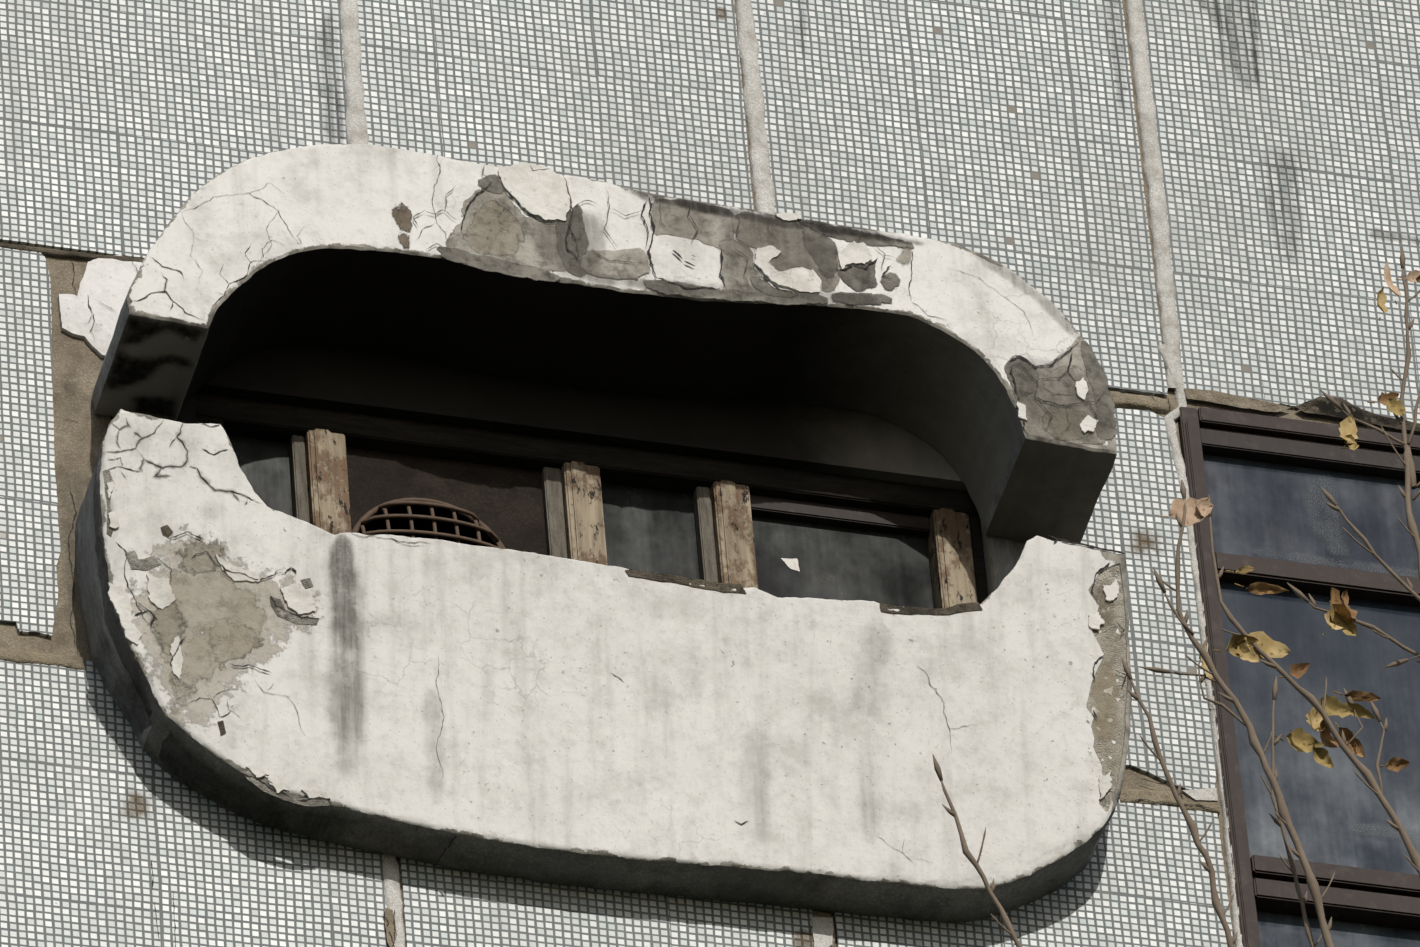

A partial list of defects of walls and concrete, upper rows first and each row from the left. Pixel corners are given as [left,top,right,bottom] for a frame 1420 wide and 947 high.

crack [70,183,303,339]
crack [413,158,485,249]
peeling [437,162,915,305]
peeling [103,470,119,536]
crack [63,419,259,504]
peeling [1004,336,1118,445]
spalling [1184,388,1420,431]
peeling [108,525,320,680]
peeling [1086,563,1127,812]